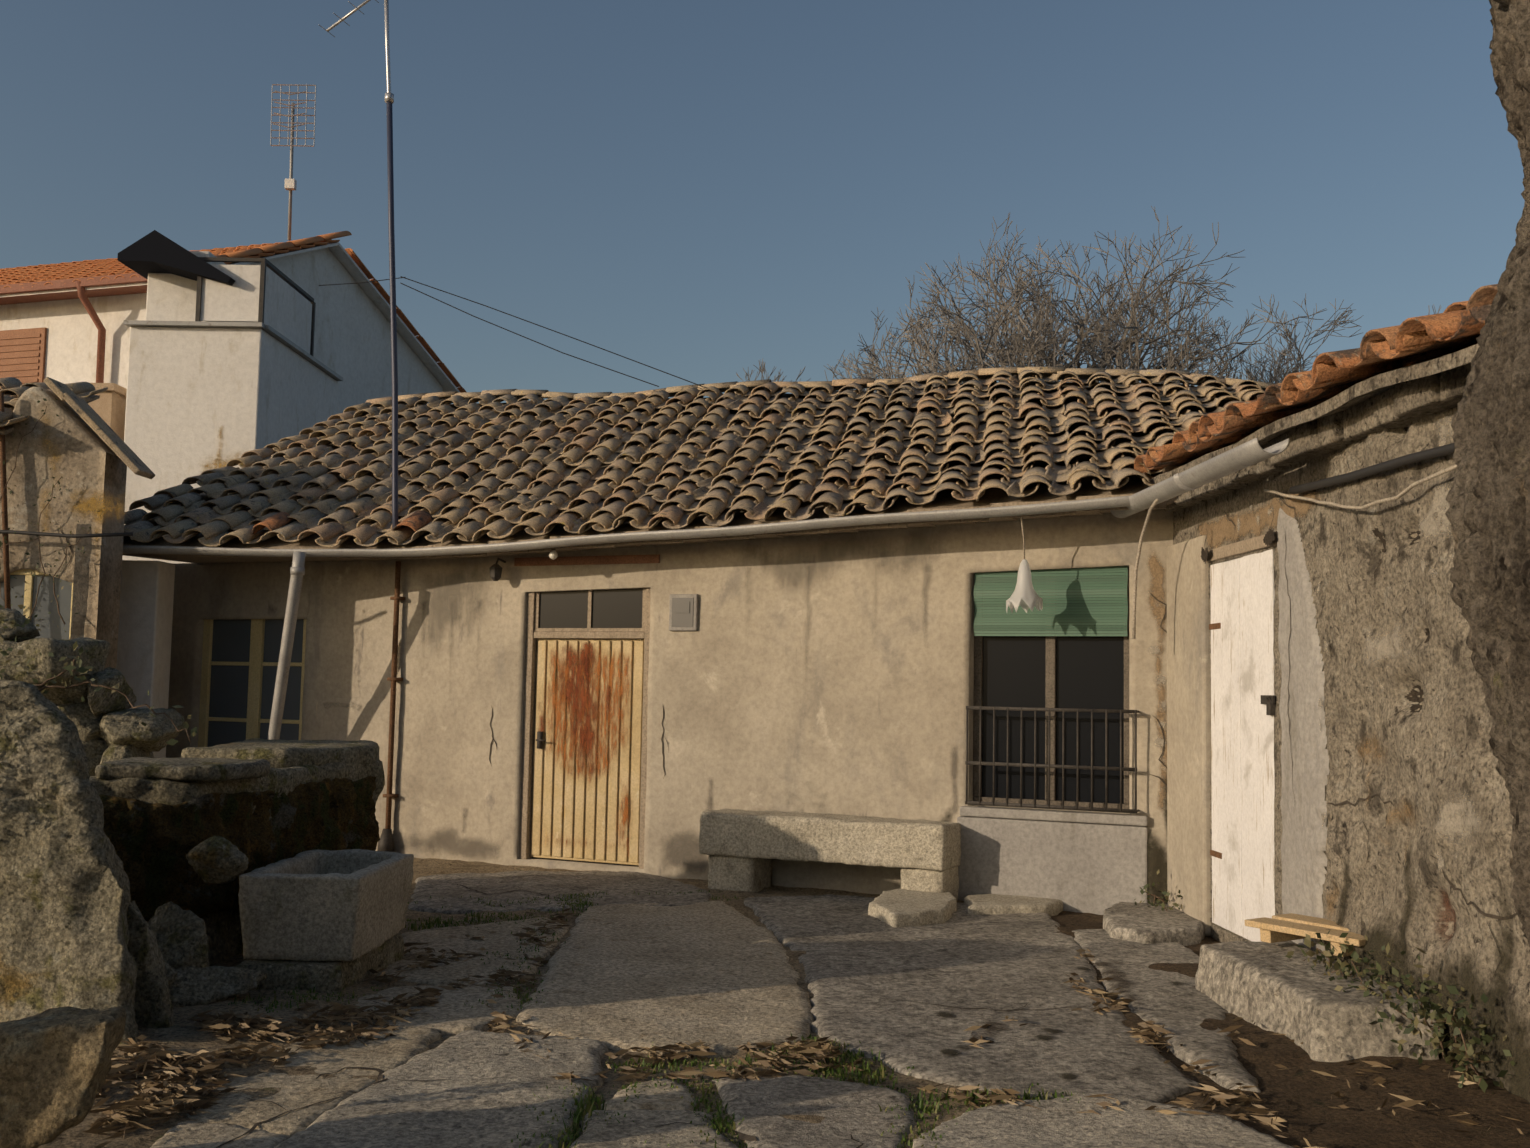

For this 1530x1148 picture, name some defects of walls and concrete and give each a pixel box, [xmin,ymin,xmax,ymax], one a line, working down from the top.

corrosion [539,643,632,777]
crack [1429,846,1517,983]